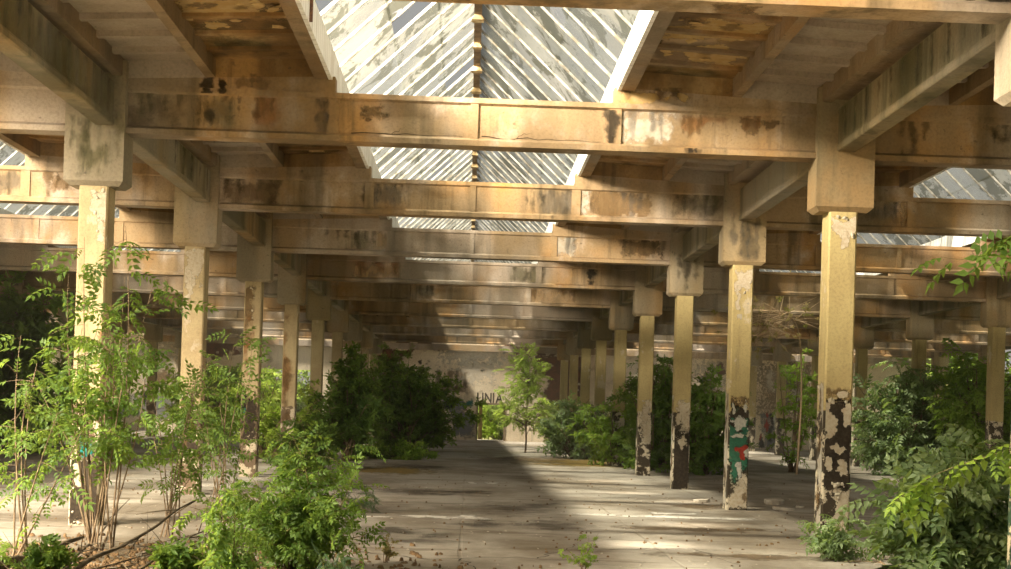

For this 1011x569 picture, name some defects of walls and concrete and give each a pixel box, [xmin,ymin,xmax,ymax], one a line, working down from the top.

water stain [199,77,227,94]
water stain [603,91,689,143]
peeling [638,399,652,446]
peeling [670,354,851,534]